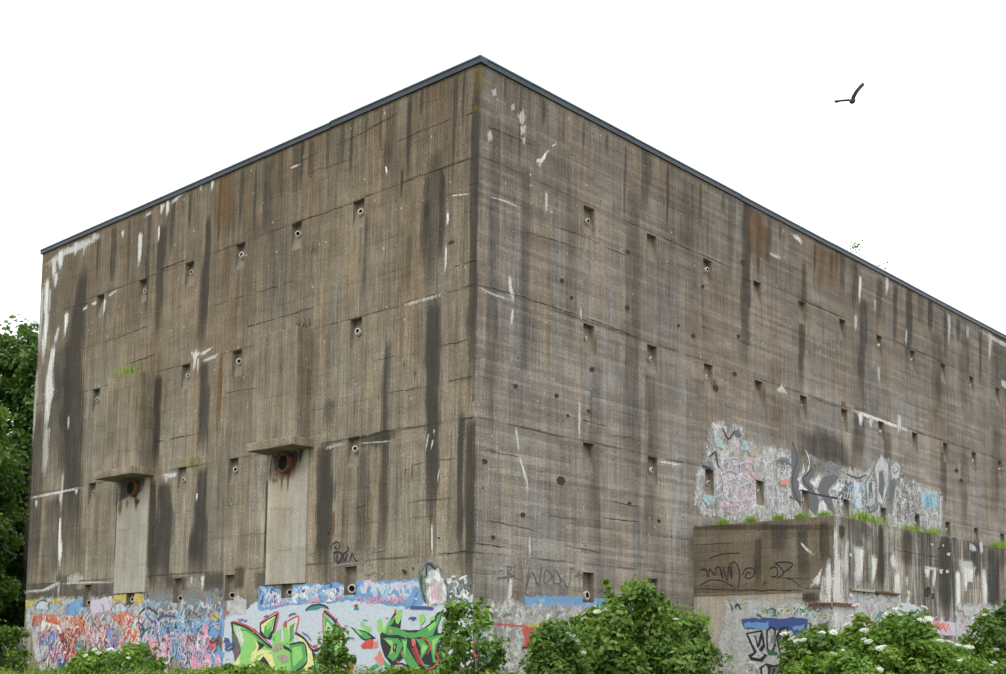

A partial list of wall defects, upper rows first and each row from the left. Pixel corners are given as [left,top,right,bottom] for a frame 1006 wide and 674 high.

water stain [400,92,423,191]
water stain [35,235,116,563]
water stain [425,306,441,512]
water stain [803,526,910,632]
water stain [925,535,998,610]